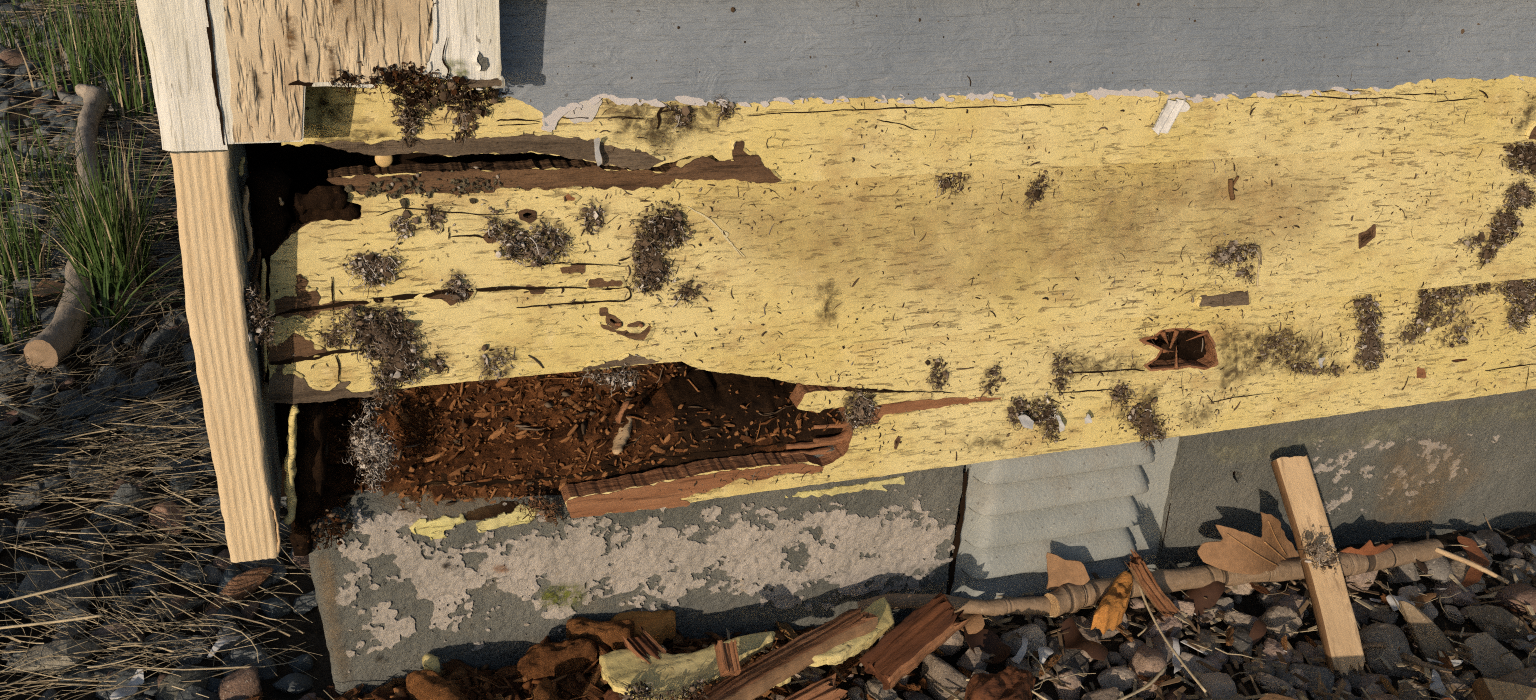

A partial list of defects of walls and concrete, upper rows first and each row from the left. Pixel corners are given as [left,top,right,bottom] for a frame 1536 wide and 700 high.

crack [205,0,225,145]
peeling [268,274,393,404]
peeling [414,287,476,306]
water stain [1223,333,1325,388]
peeling [335,463,955,673]